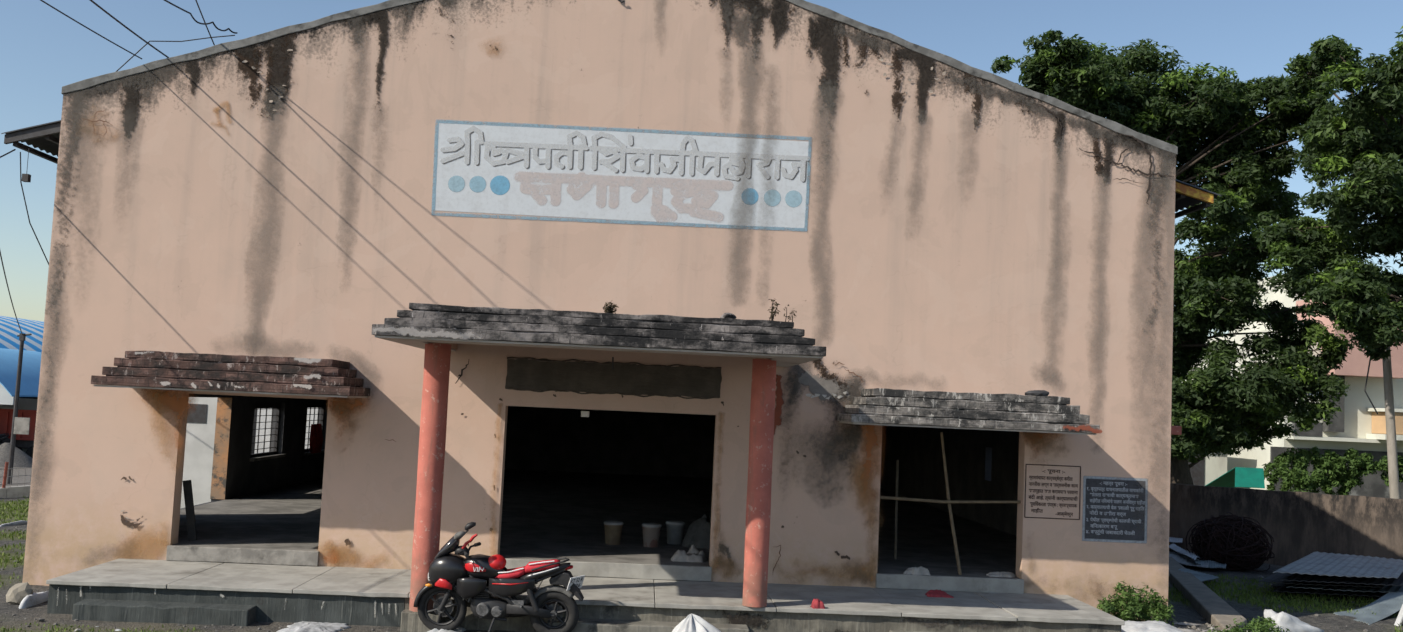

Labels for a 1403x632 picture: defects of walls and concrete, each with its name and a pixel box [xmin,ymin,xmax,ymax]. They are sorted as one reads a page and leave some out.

water stain [46,33,297,322]
water stain [342,0,454,111]
water stain [709,0,1176,332]
water stain [820,379,862,469]